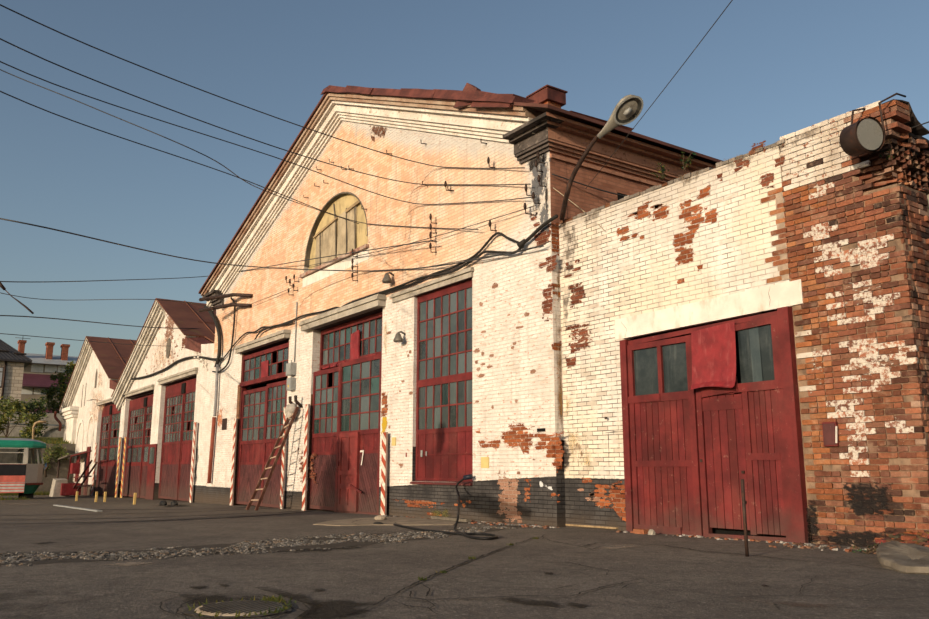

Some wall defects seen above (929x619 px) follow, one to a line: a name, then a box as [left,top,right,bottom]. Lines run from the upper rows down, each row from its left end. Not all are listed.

peeling [734,140,766,172]
peeling [617,173,722,271]
peeling [551,324,593,369]
peeling [760,100,929,548]
peeling [476,421,565,473]
peeling [496,469,531,524]
peeling [578,478,626,521]
crack [159,535,652,619]